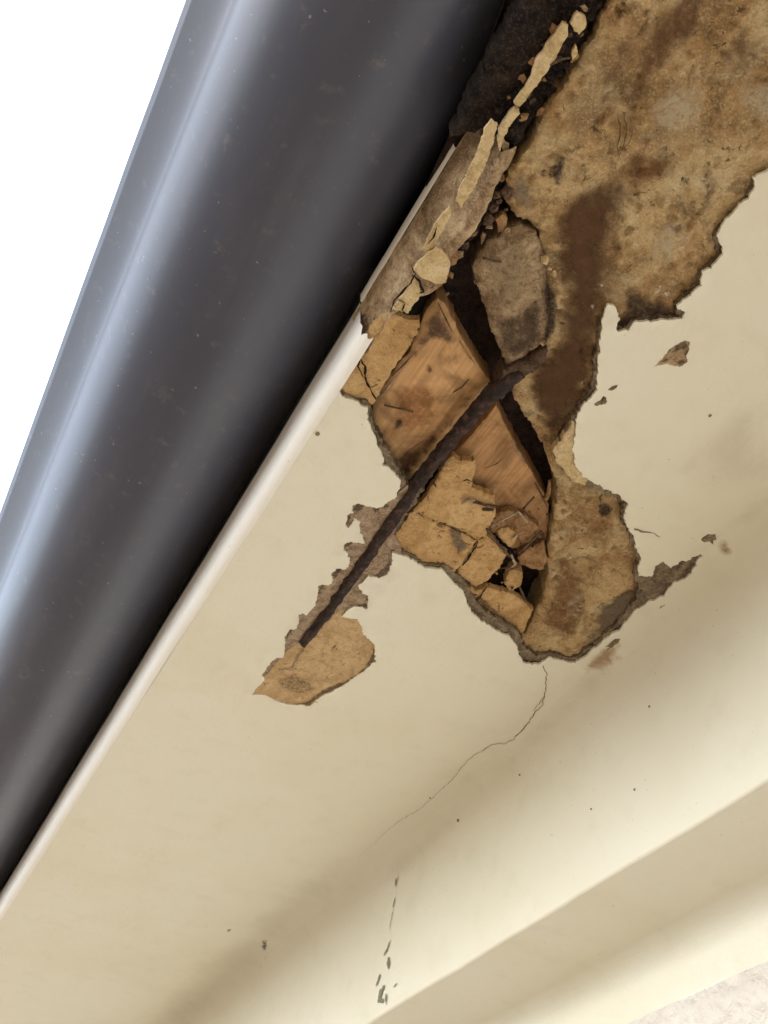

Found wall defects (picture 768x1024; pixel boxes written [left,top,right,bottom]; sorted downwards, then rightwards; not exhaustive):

flaking render [254,0,768,707]
rust [298,371,525,648]
crack [382,666,548,836]